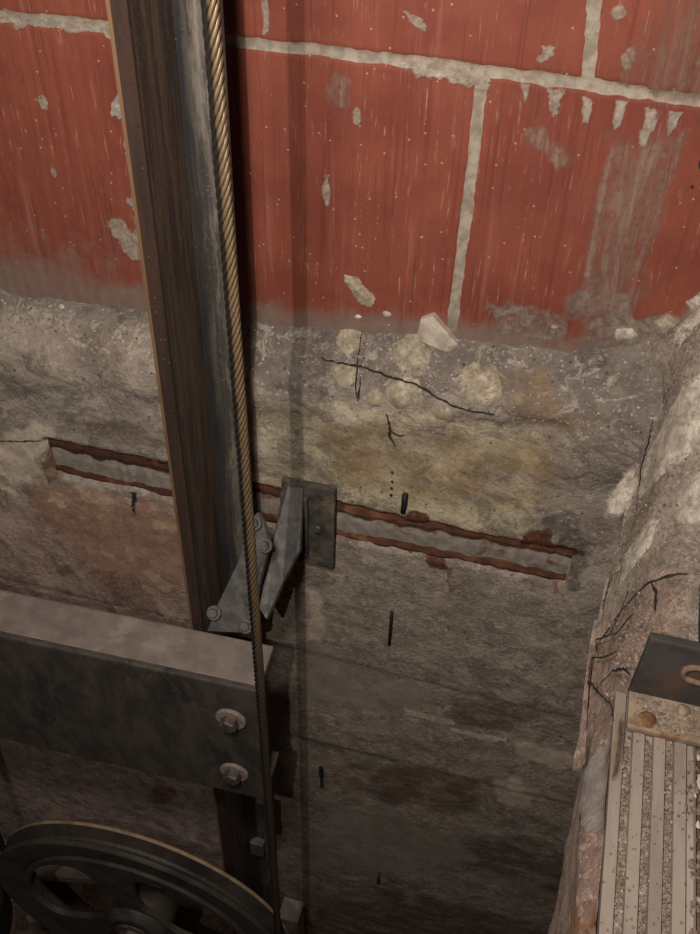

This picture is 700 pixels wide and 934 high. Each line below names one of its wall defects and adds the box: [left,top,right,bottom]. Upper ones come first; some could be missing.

water stain [582,97,592,123]
water stain [613,100,627,129]
peeling [108,198,140,260]
water stain [567,107,684,316]
crack [322,333,494,415]
spalling [0,289,191,629]
corrosion [405,510,429,522]
corrosion [426,555,452,593]
corrosion [521,529,584,564]
spalling [241,319,663,934]
crack [587,573,687,721]
spalling [0,738,223,870]